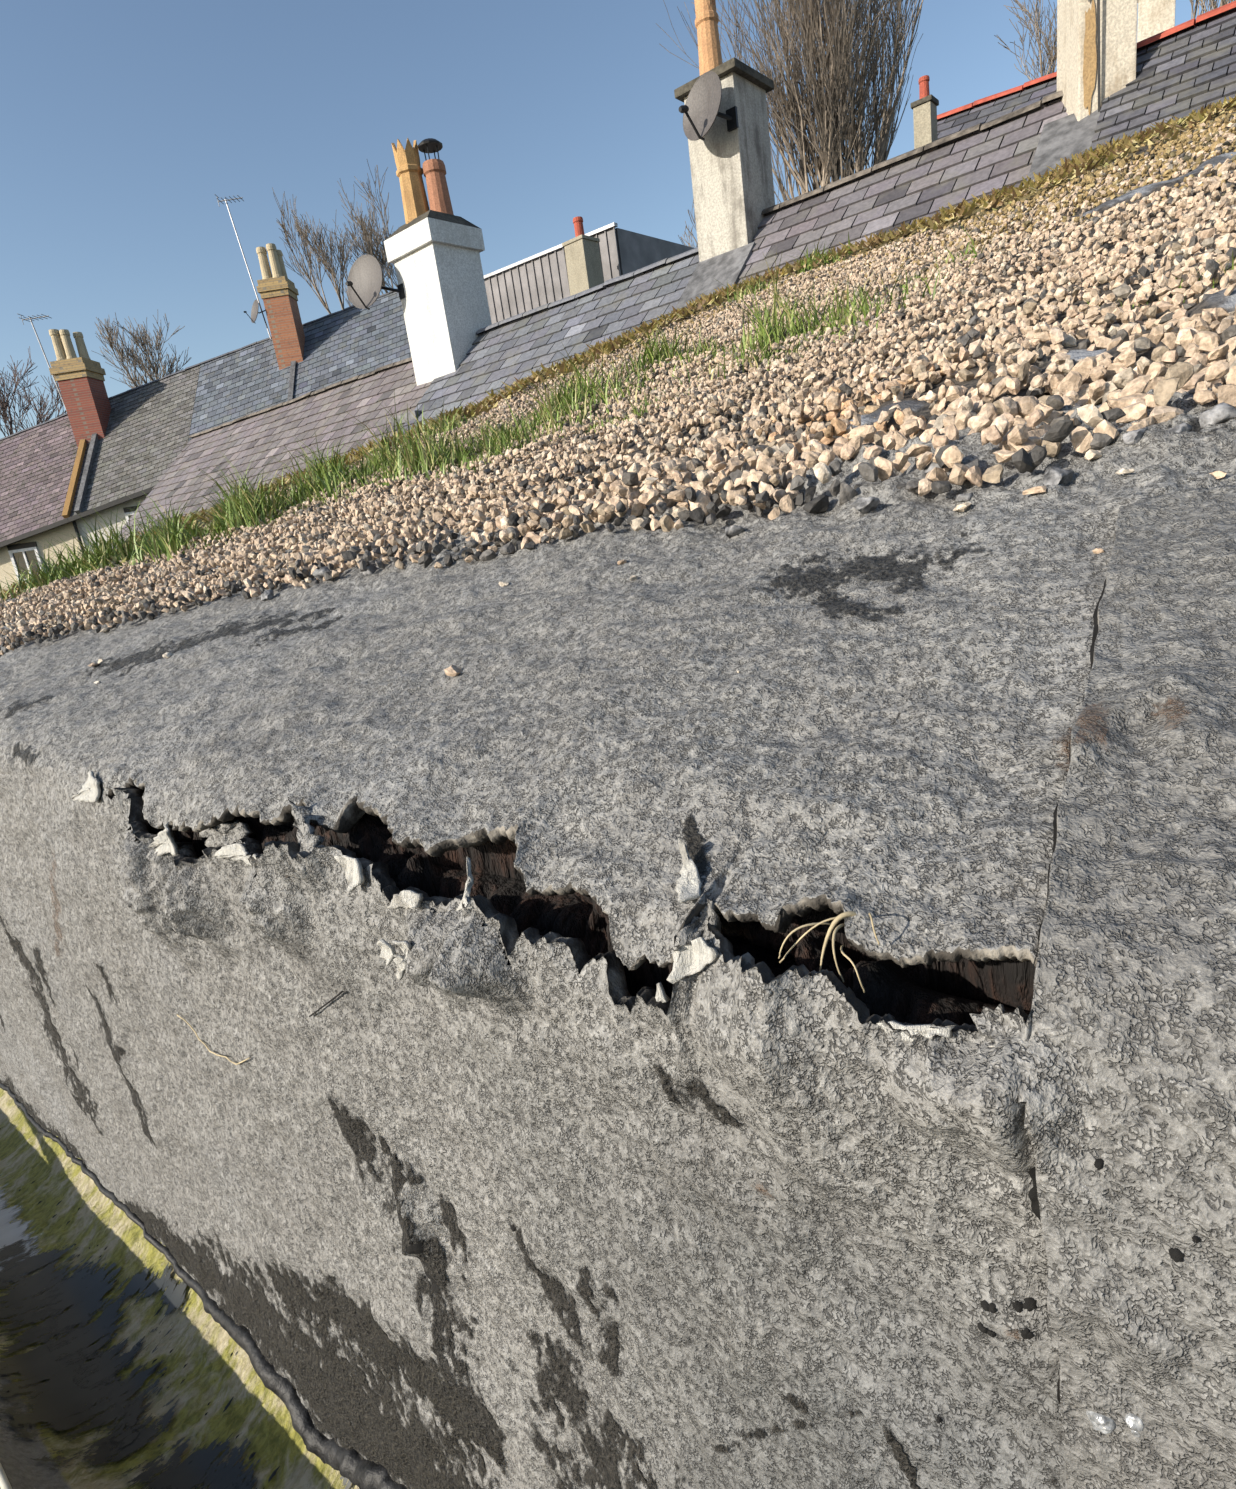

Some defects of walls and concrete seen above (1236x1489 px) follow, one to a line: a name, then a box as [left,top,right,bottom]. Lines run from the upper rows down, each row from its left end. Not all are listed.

crack [1083,579,1106,700]
crack [681,814,710,891]
crack [1032,736,1071,969]
damp [0,1074,86,1165]
damp [0,915,103,1135]
damp [85,963,157,1148]
crack [653,1065,743,1128]
crack [1028,1167,1041,1222]
damp [0,1097,507,1489]
damp [512,1223,657,1489]
crack [1055,1371,1063,1422]